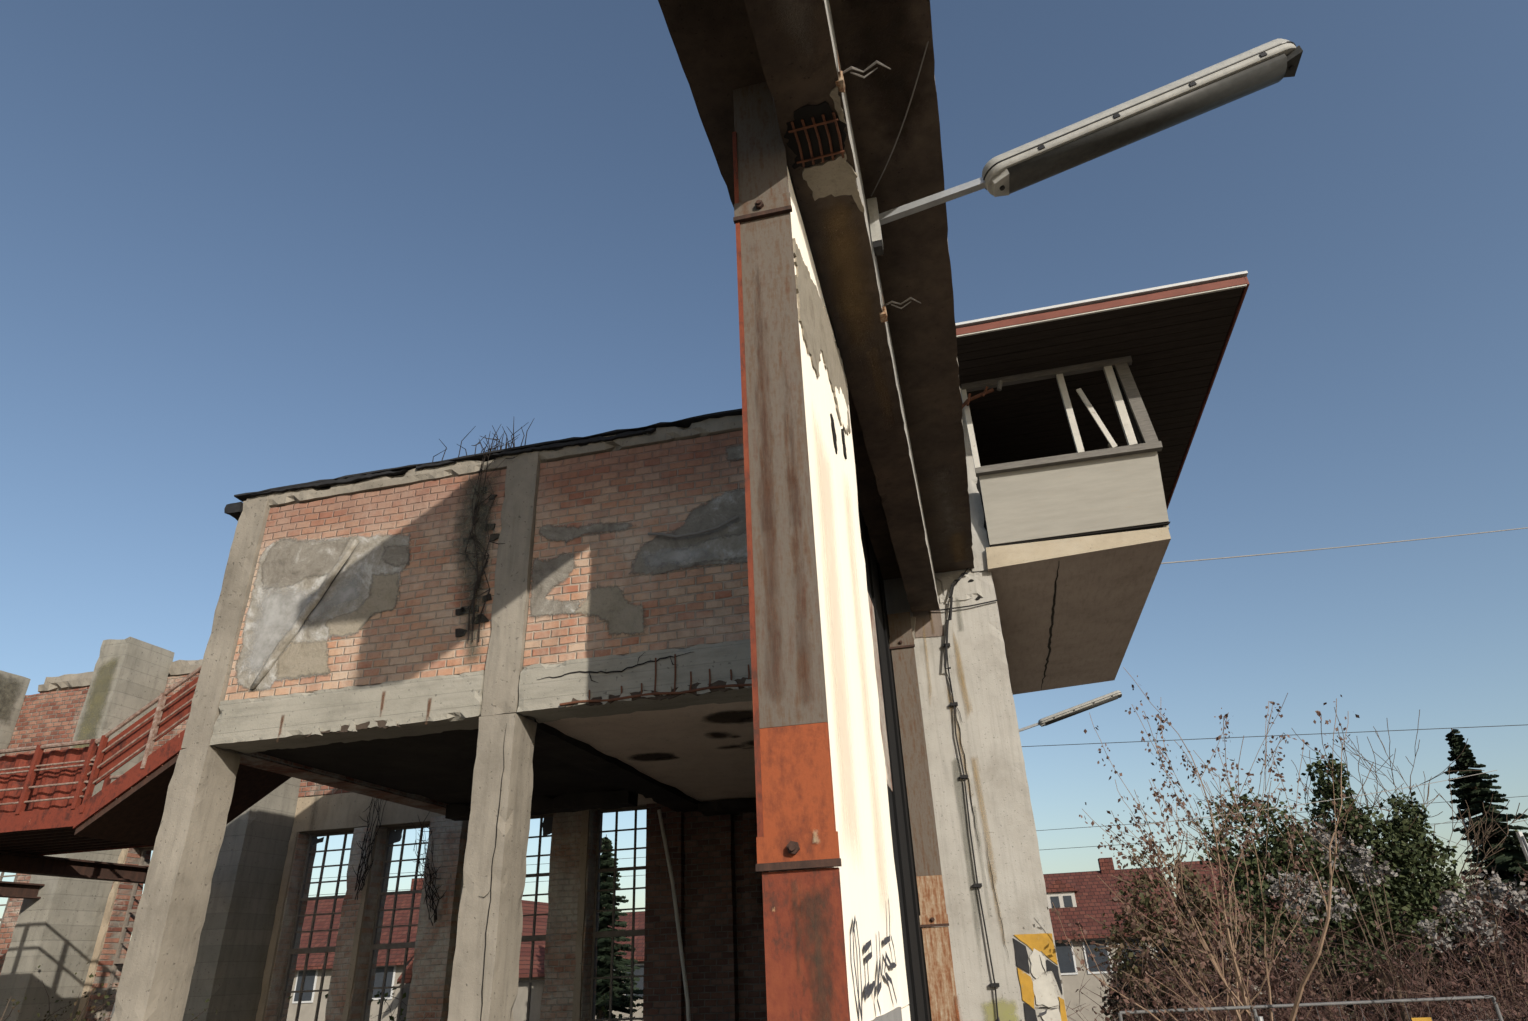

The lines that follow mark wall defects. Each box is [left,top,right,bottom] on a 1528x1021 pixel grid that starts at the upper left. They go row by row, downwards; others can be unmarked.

flaking render [236,534,411,692]
damp [454,478,492,658]
flaking render [530,489,748,635]
spalling [559,654,752,708]
damp [705,711,754,749]